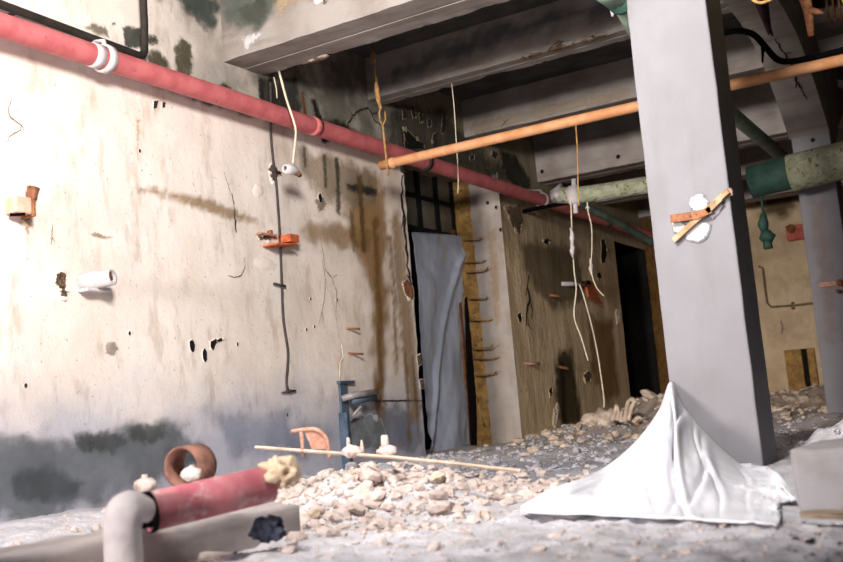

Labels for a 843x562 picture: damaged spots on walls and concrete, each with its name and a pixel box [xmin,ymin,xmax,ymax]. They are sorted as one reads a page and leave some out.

damp [87,23,114,37]
damp [123,26,192,75]
damp [180,0,294,49]
damp [259,78,350,129]
spalling [402,111,438,150]
damp [301,147,376,213]
spalling [52,267,70,302]
corrosion [308,176,397,413]
spalling [188,337,225,363]
damp [223,414,311,455]
damp [0,422,196,519]